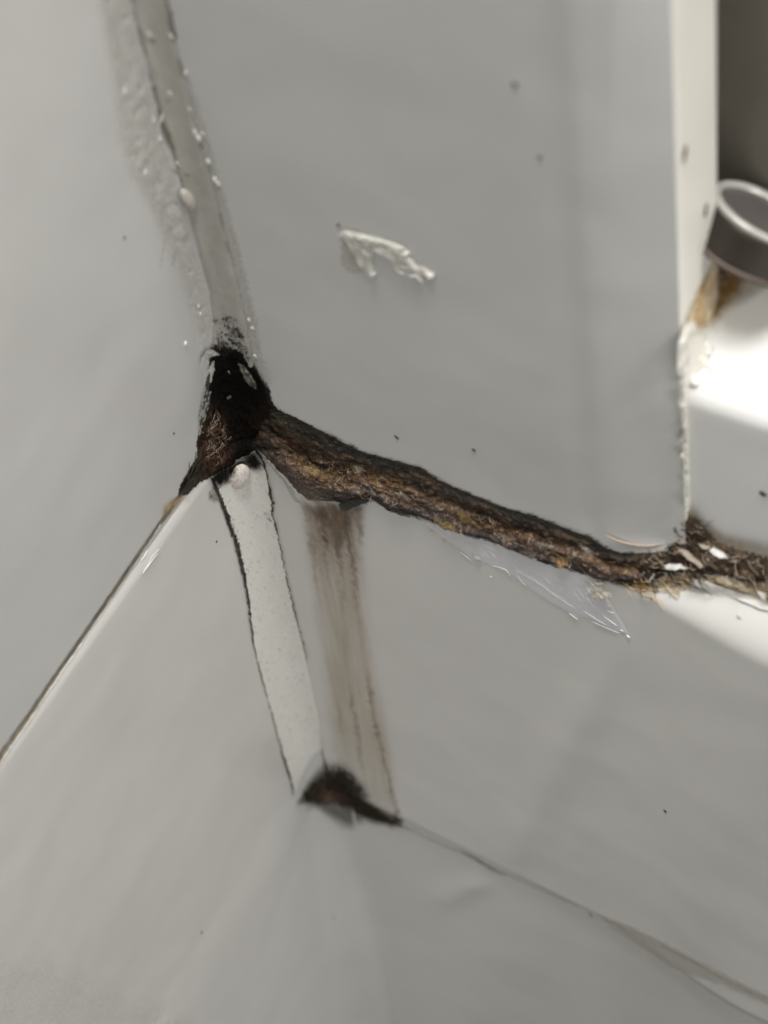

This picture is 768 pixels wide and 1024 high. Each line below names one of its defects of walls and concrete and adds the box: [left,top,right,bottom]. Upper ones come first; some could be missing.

crack [210,478,294,795]
crack [254,449,307,659]